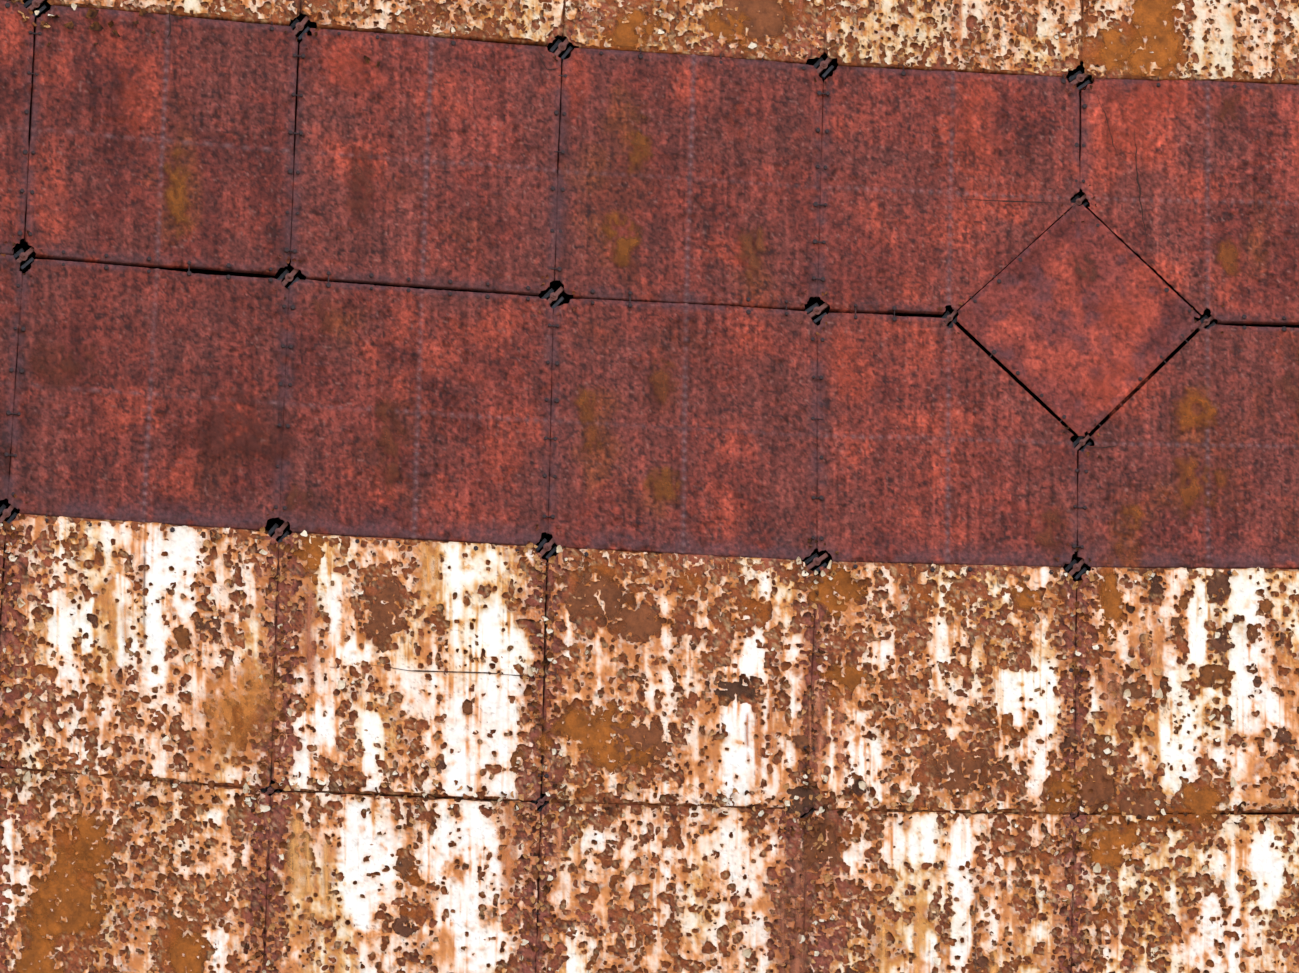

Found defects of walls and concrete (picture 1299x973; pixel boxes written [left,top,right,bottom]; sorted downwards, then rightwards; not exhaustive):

peeling [11,0,1299,93]
corrosion [704,0,803,48]
corrosion [1100,0,1179,76]
corrosion [363,578,407,650]
corrosion [550,568,667,647]
corrosion [1097,574,1126,640]
corrosion [536,702,676,774]
peeling [0,494,1299,973]
corrosion [707,676,772,760]
corrosion [927,740,1008,800]
corrosion [1045,740,1220,867]
corrosion [14,813,117,973]